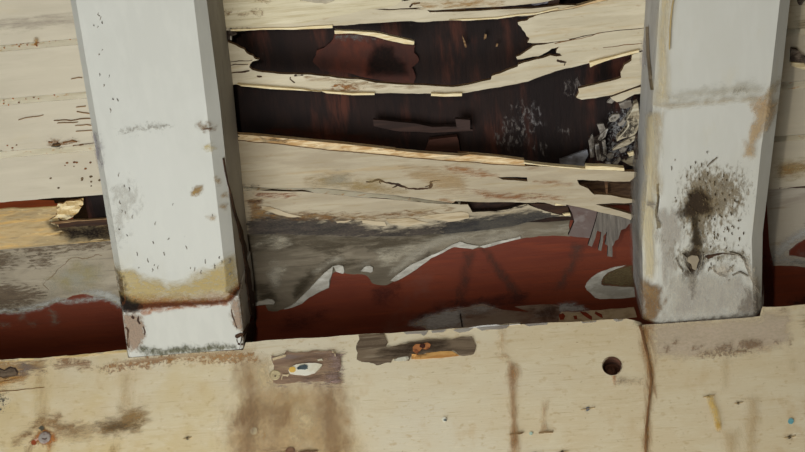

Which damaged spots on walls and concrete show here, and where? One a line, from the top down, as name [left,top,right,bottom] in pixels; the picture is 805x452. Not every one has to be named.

water stain [646,27,661,90]
peeling [588,98,638,166]
peeling [0,241,258,373]
water stain [114,261,236,298]
crack [366,179,440,190]
peeling [247,220,570,312]
peeling [356,265,637,365]
water stain [634,116,749,321]
peeling [766,188,805,267]
peeling [271,350,343,387]